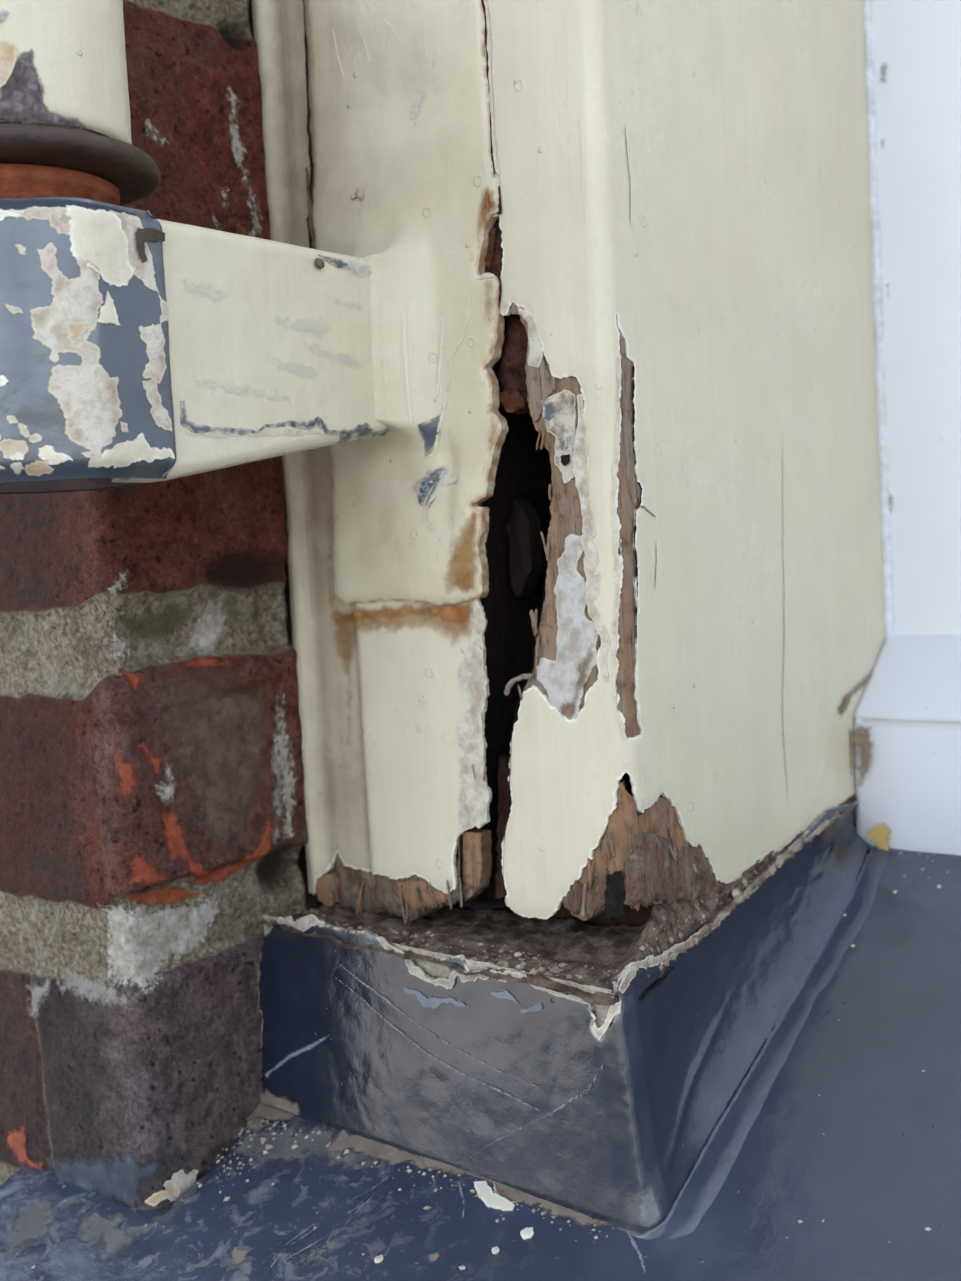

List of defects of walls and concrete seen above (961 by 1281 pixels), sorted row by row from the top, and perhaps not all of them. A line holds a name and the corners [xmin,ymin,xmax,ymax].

peeling [0,40,86,131]
peeling [0,205,390,476]
peeling [402,290,472,528]
corrosion [479,191,491,222]
crack [481,0,502,215]
crack [495,275,503,307]
spalling [459,313,553,910]
peeling [587,1000,622,1040]